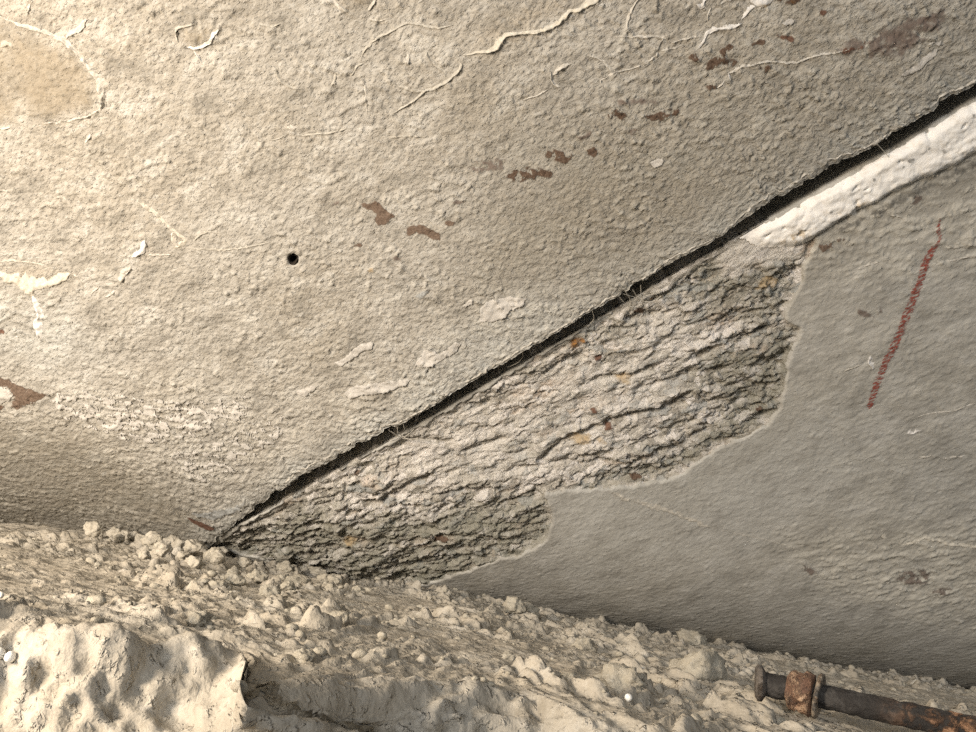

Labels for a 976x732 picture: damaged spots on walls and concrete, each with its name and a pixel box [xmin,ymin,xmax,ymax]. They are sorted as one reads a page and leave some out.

crack [331,22,451,115]
crack [391,0,600,138]
crack [588,0,742,89]
corrosion [688,44,737,70]
crack [717,47,853,88]
corrosion [472,149,572,182]
crack [138,202,266,251]
corrosion [362,201,394,226]
corrosion [407,221,454,240]
corrosion [0,378,47,410]
spalling [192,209,815,585]
peeling [52,389,290,483]